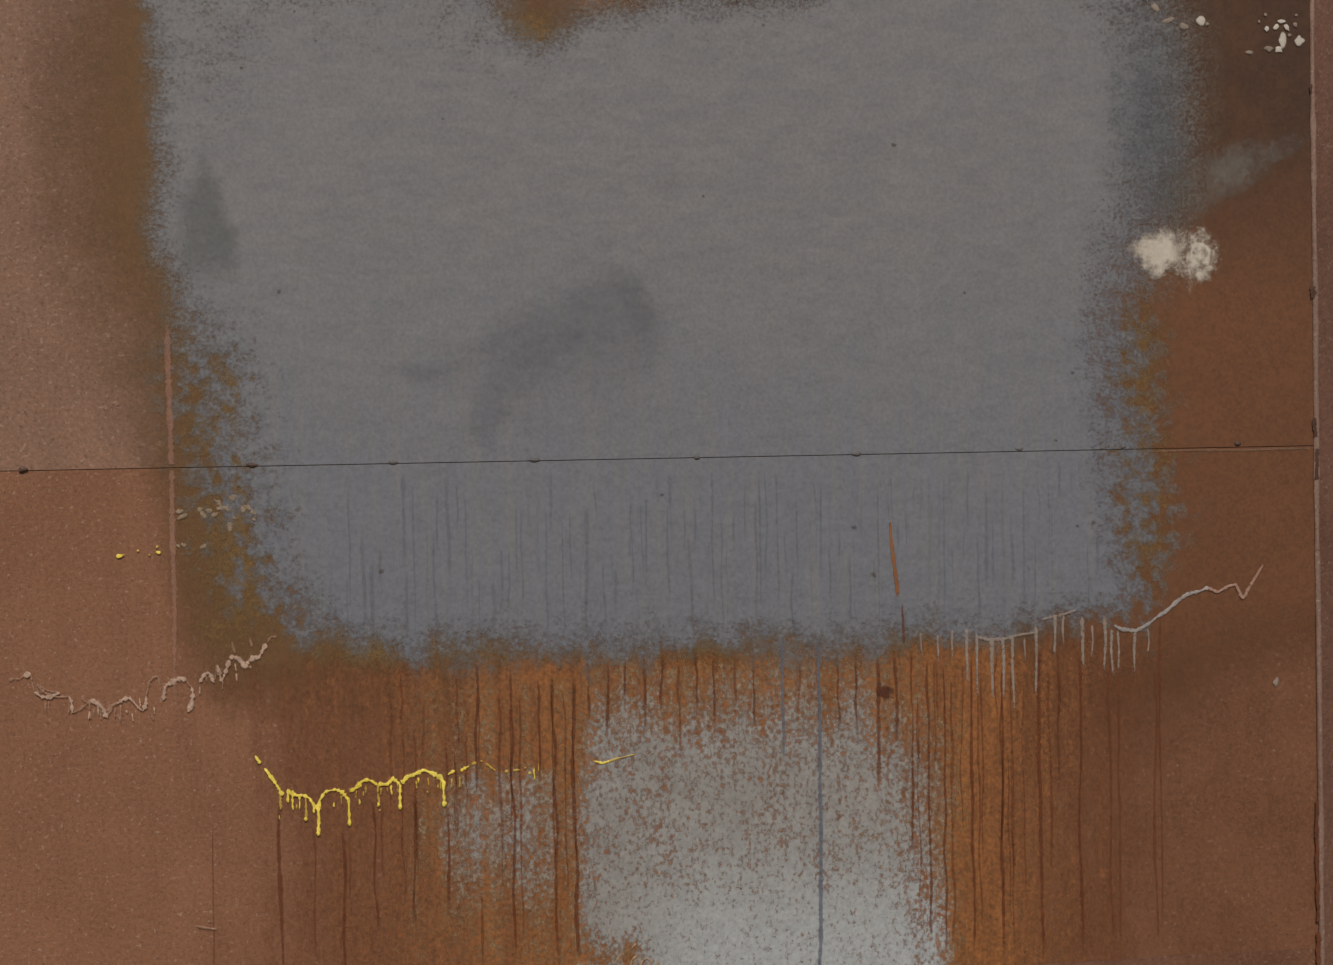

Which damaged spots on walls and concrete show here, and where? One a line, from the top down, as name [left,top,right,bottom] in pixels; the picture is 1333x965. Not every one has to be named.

water stain [84,0,1316,729]
corrosion [283,523,1126,965]